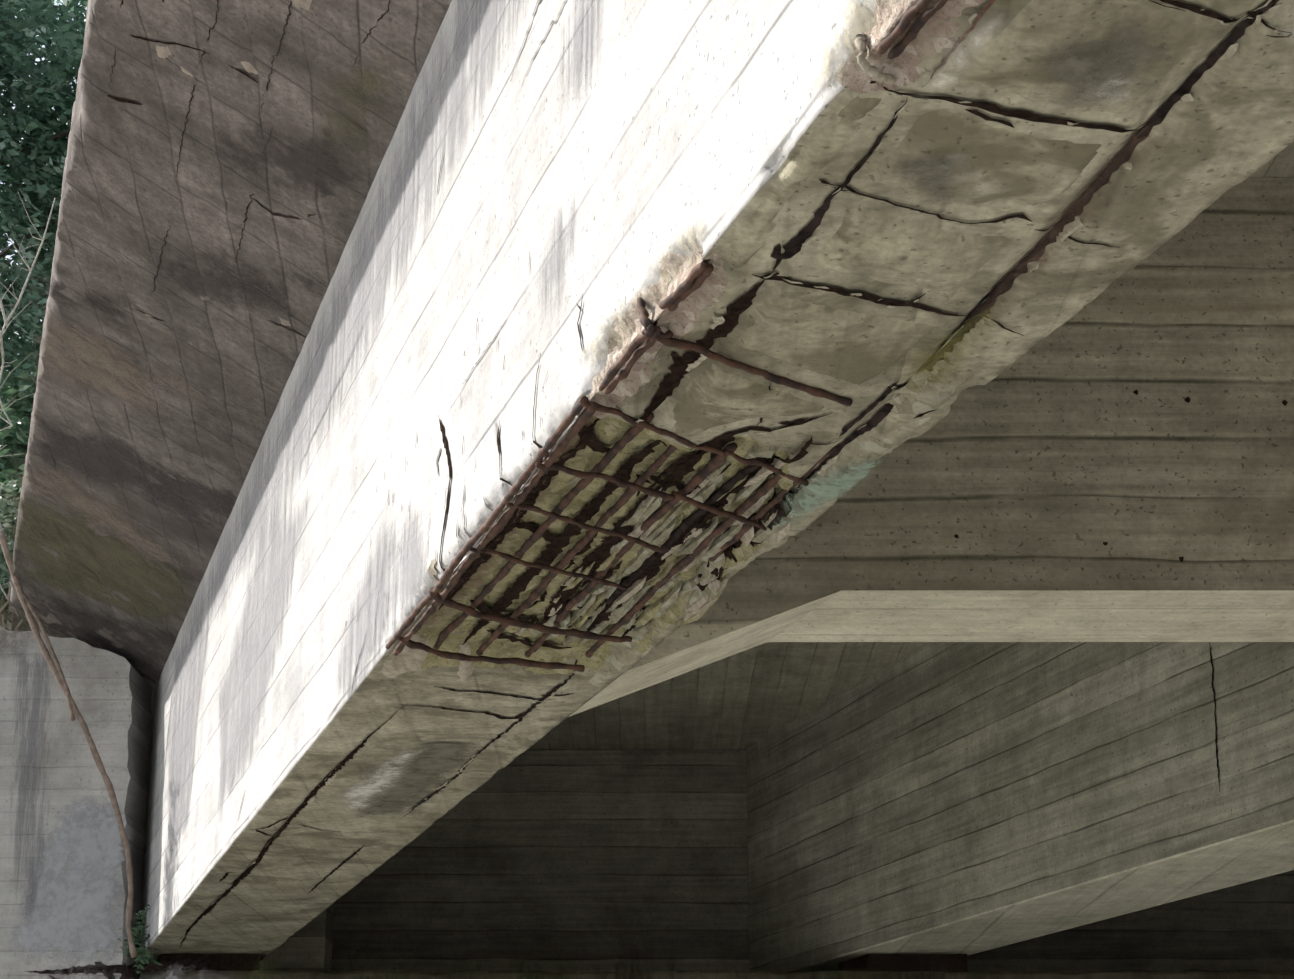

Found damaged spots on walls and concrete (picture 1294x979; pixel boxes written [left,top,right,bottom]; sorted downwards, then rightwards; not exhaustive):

crack [134,229,170,321]
crack [106,0,316,264]
damp [0,0,518,908]
crack [298,312,369,468]
crack [351,0,390,71]
crack [427,353,549,585]
crack [576,296,584,353]
spalling [380,240,971,683]
spalling [837,0,985,94]
crack [635,0,1294,490]
crack [26,655,583,979]
crack [1210,647,1220,789]